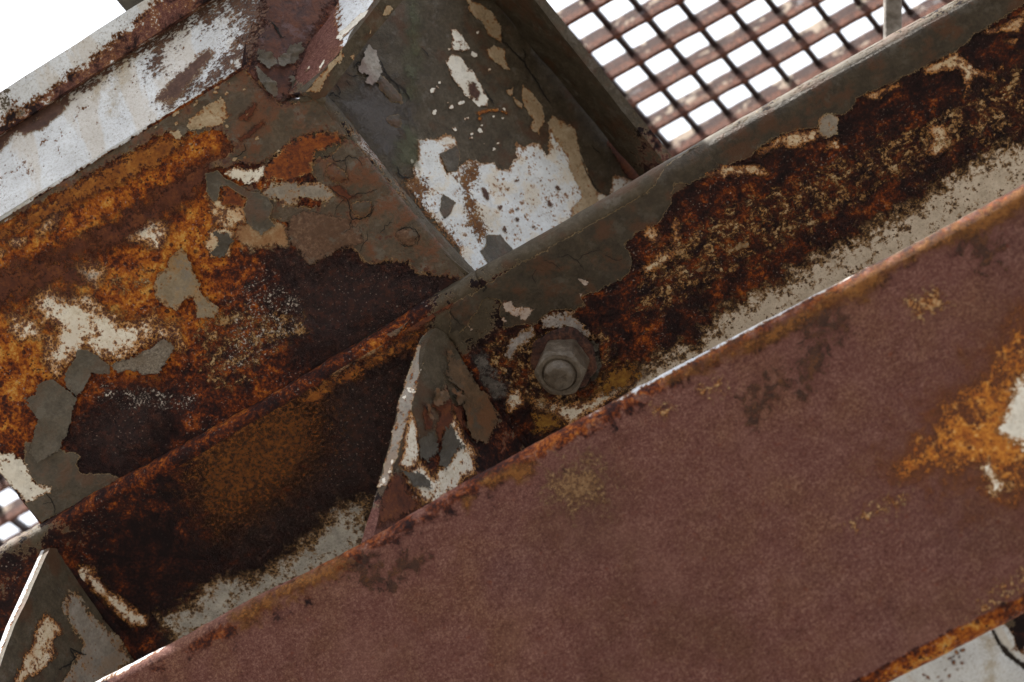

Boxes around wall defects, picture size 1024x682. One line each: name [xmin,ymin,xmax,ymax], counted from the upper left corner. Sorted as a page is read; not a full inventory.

rust [71,378,170,470]
peeling [0,218,307,523]
rust [0,0,342,315]
peeling [0,0,632,281]
rust [173,328,464,569]
rust [234,210,457,364]
rust [467,81,507,121]
peeling [377,0,1024,506]
rust [665,188,1024,433]
rust [843,303,1024,533]
peeling [14,590,130,682]
rust [334,545,434,594]